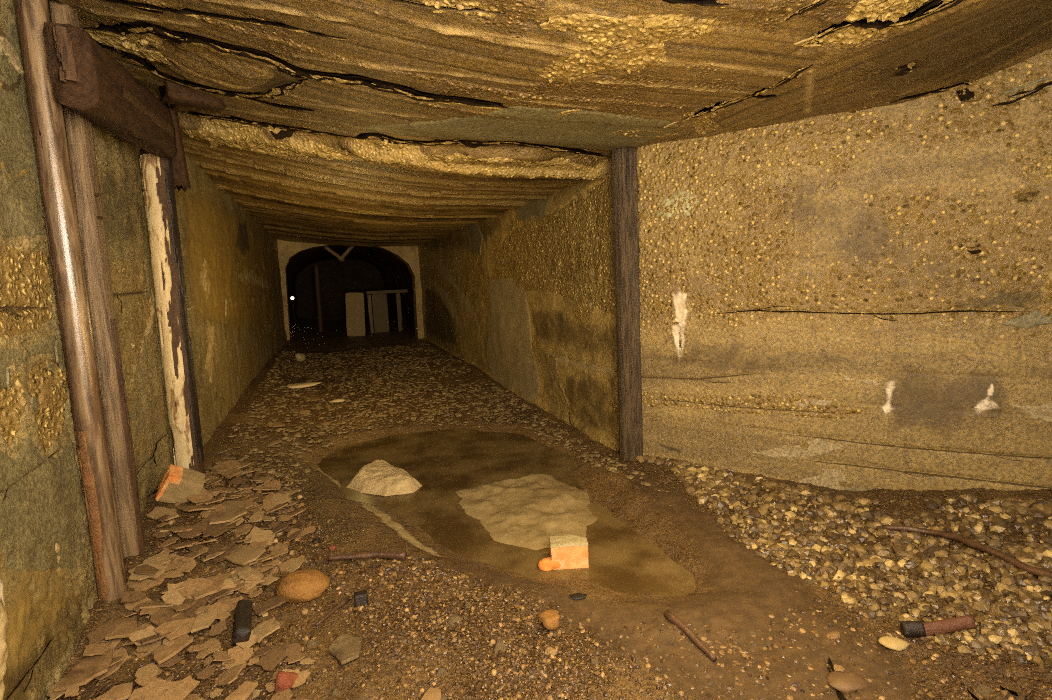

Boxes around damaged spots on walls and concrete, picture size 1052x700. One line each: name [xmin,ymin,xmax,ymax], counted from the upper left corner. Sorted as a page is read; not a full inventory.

crack [662,0,729,8]
crack [83,0,610,158]
crack [682,0,970,123]
crack [992,79,1052,106]
damp [672,292,687,357]
damp [882,381,998,418]